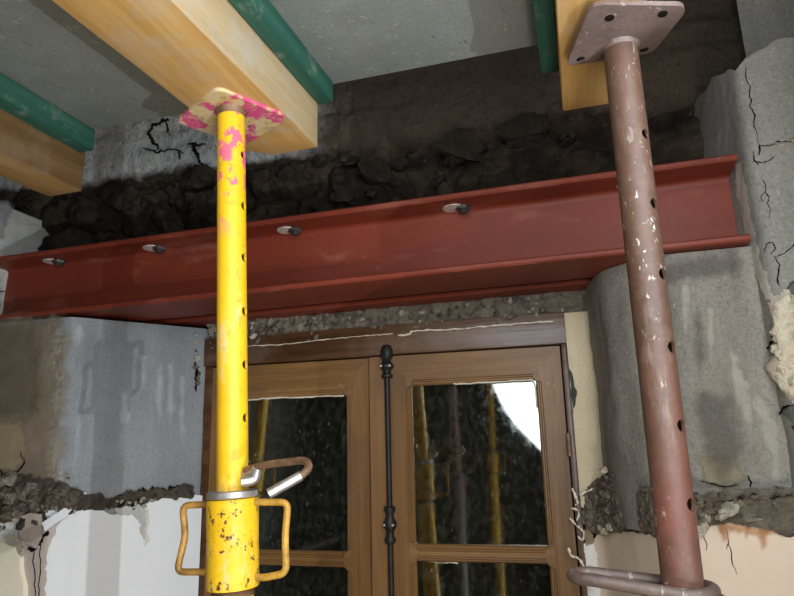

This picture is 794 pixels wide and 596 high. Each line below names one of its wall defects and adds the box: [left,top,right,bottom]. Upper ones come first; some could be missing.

crack [143,118,206,164]
crack [745,68,794,218]
crack [764,242,794,286]
spalling [0,471,195,596]
spalling [567,466,656,567]
spalling [693,486,794,537]
crack [32,541,41,596]
peeling [587,586,601,596]